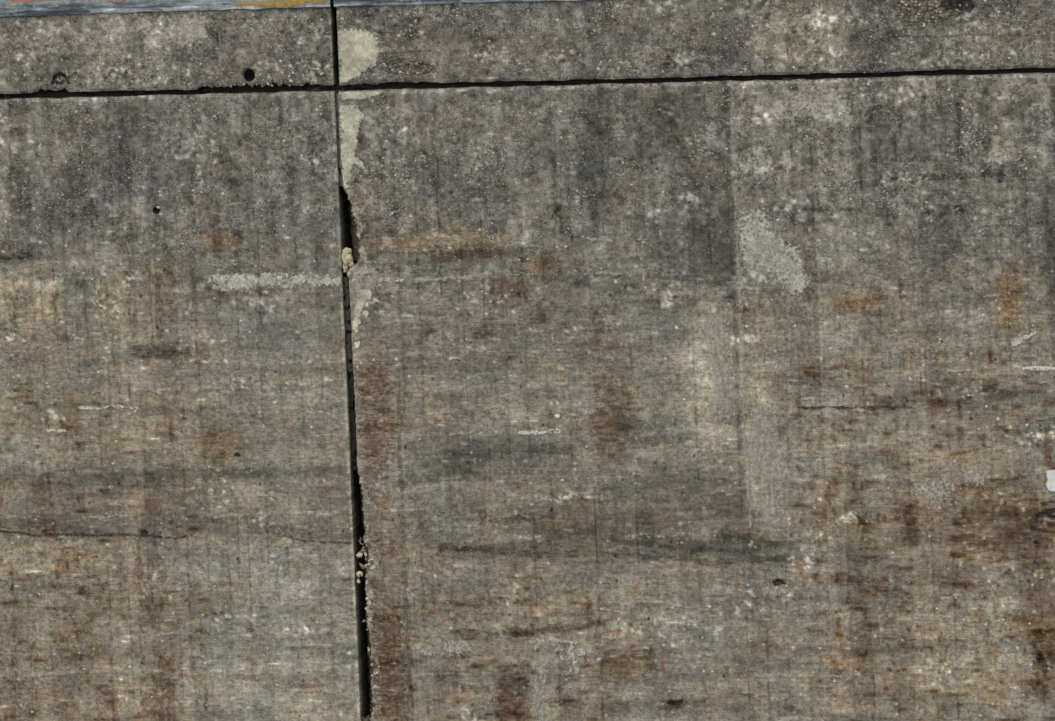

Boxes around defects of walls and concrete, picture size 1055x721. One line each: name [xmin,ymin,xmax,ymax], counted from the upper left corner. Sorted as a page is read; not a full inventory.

spalling [343,188,368,265]